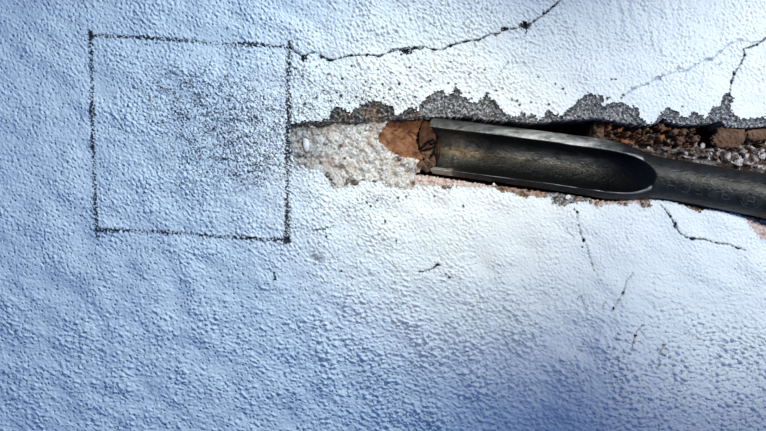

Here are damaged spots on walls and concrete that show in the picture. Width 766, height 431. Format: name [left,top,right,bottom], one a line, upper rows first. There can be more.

crack [289,1,559,62]
crack [631,38,766,90]
spalling [288,73,766,240]
crack [661,205,745,250]